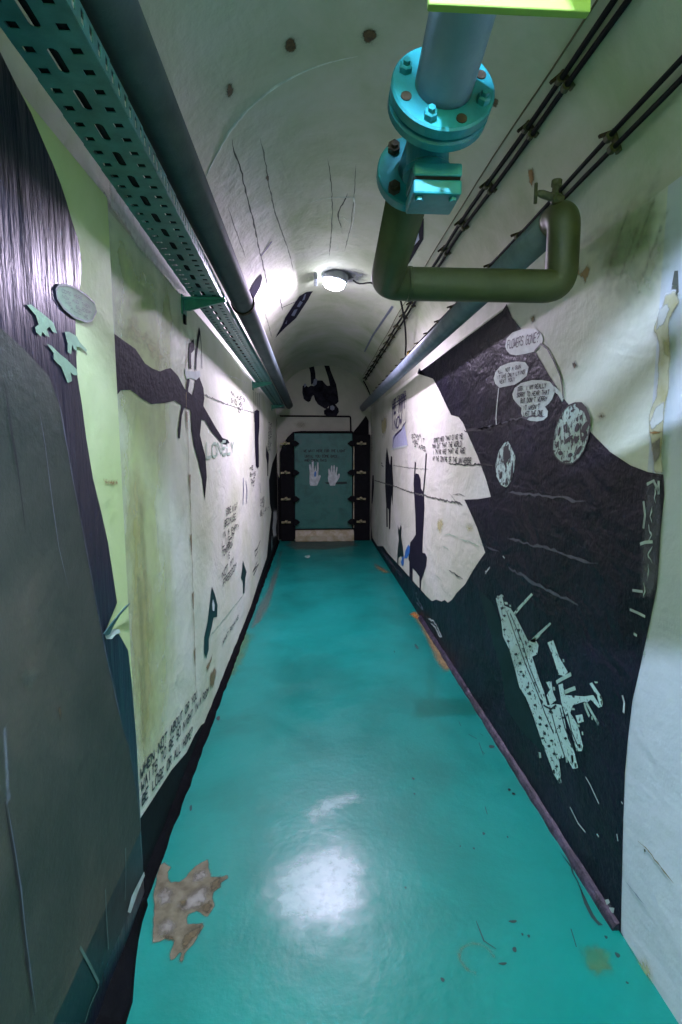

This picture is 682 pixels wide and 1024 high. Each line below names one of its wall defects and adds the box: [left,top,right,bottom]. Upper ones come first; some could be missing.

crack [229,139,294,337]
crack [328,163,356,255]
peeling [128,860,228,961]